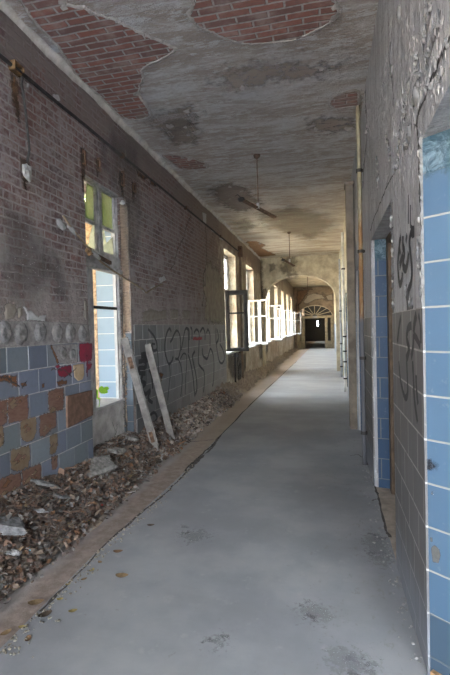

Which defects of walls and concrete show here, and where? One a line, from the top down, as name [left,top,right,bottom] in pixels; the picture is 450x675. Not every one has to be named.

corrosion [10,72,21,123]
spalling [17,0,178,121]
spalling [162,154,209,170]
spalling [185,0,341,46]
peeling [328,0,450,313]
crack [414,36,450,203]
peeling [246,241,275,256]
spalling [0,388,64,497]